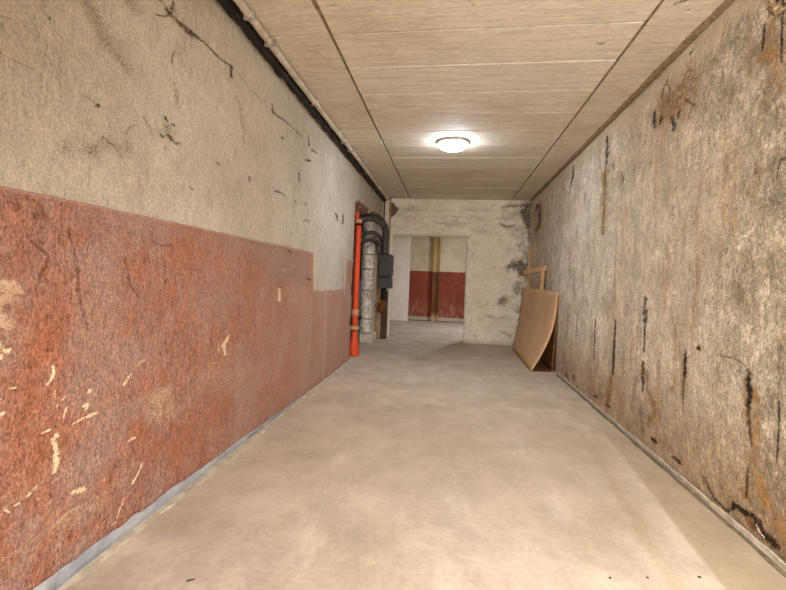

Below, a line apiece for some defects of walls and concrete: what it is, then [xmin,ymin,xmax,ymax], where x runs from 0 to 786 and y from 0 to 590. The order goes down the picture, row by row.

crack [156,0,233,78]
leakage [497,202,542,307]
peeling [0,274,27,334]